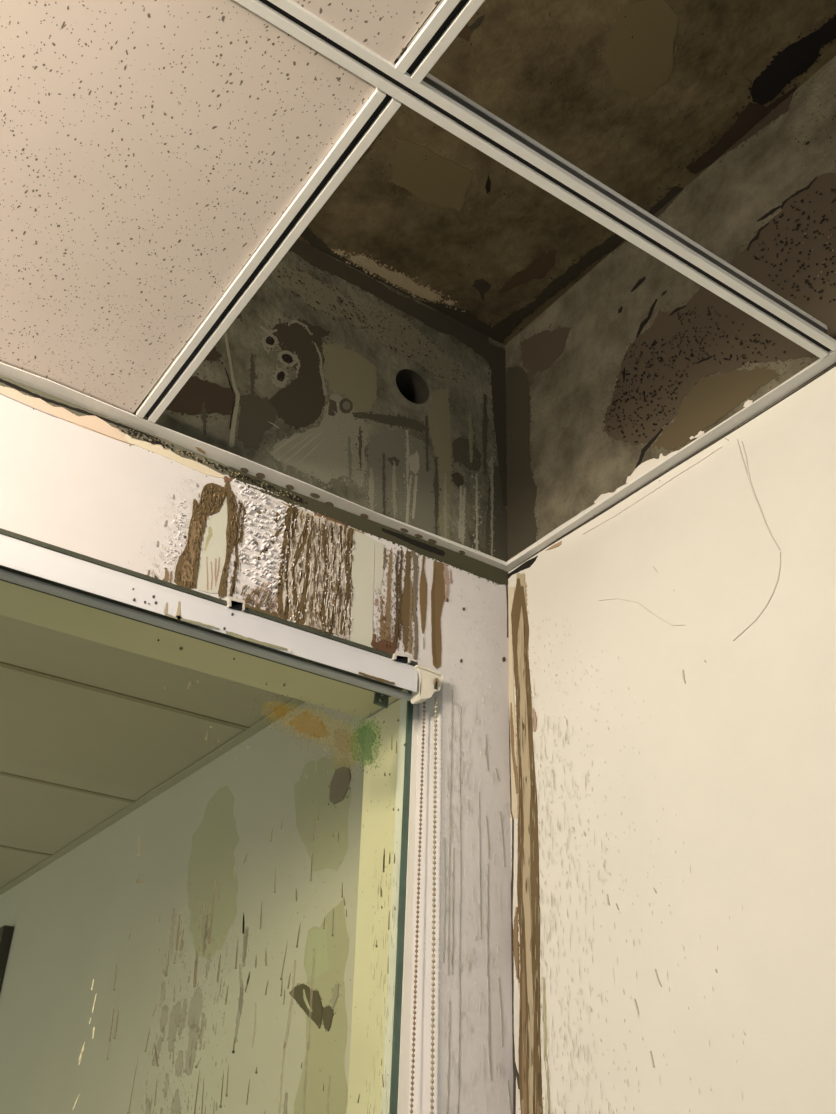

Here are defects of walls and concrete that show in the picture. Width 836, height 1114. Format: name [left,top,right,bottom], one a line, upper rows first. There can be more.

water stain [597,0,684,106]
water stain [646,14,836,218]
water stain [649,362,787,456]
rust [206,557,220,591]
water stain [186,785,240,960]
water stain [294,755,351,872]
water stain [442,573,633,1114]
spalling [289,982,334,1031]
water stain [294,897,349,1114]